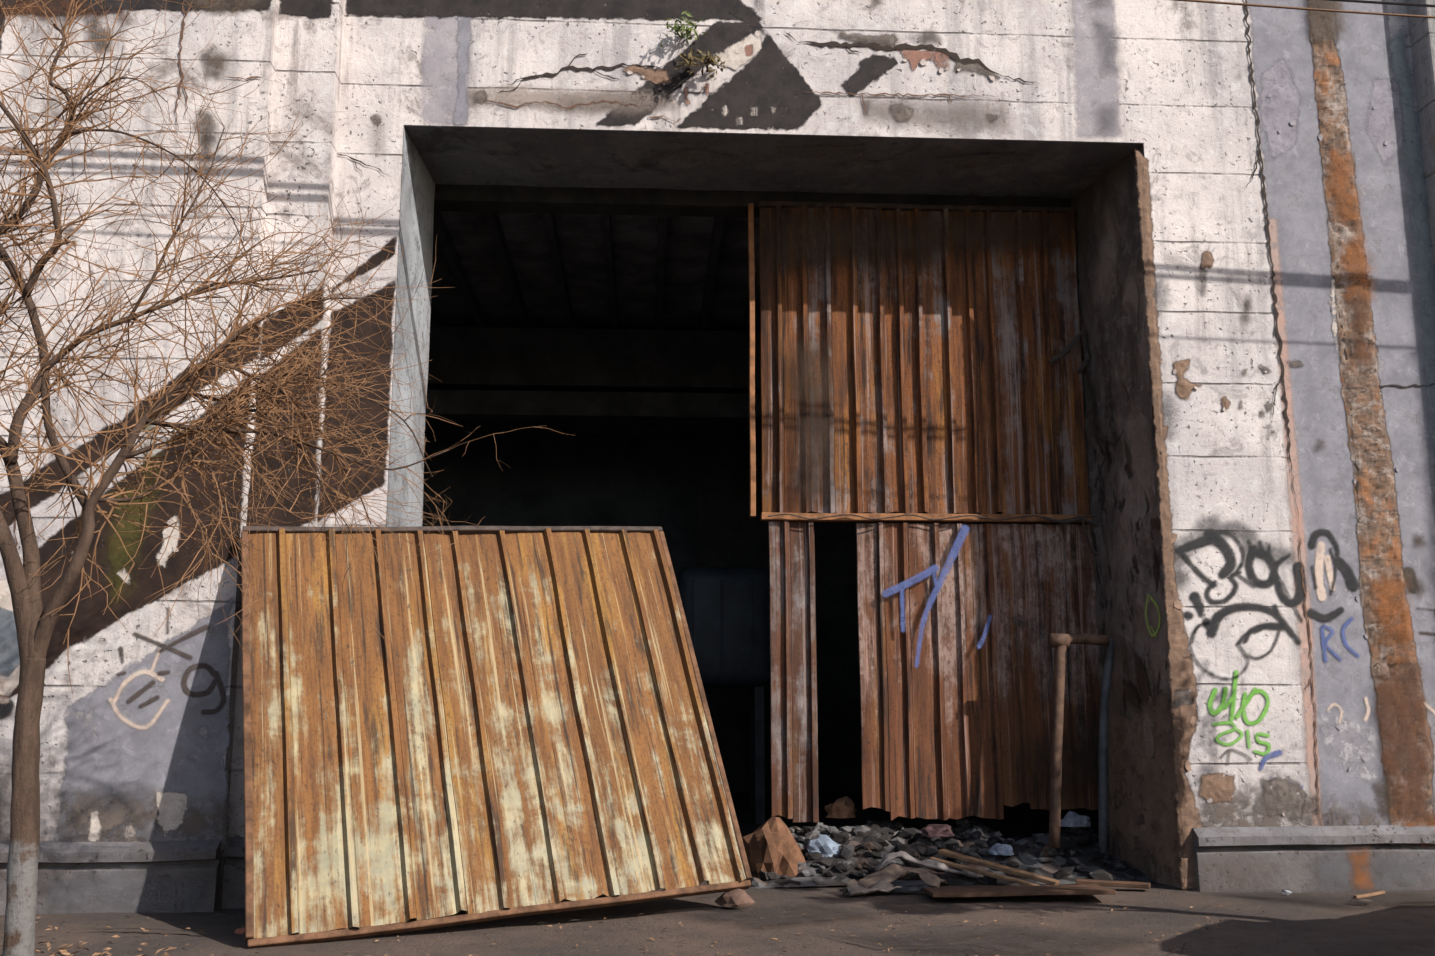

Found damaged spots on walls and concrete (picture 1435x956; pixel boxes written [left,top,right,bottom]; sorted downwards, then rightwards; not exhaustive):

crack [498,53,663,93]
crack [786,33,1039,114]
spalling [902,50,1000,81]
corrosion [1345,240,1372,365]
crack [1244,0,1322,825]
corrosion [1379,637,1435,827]